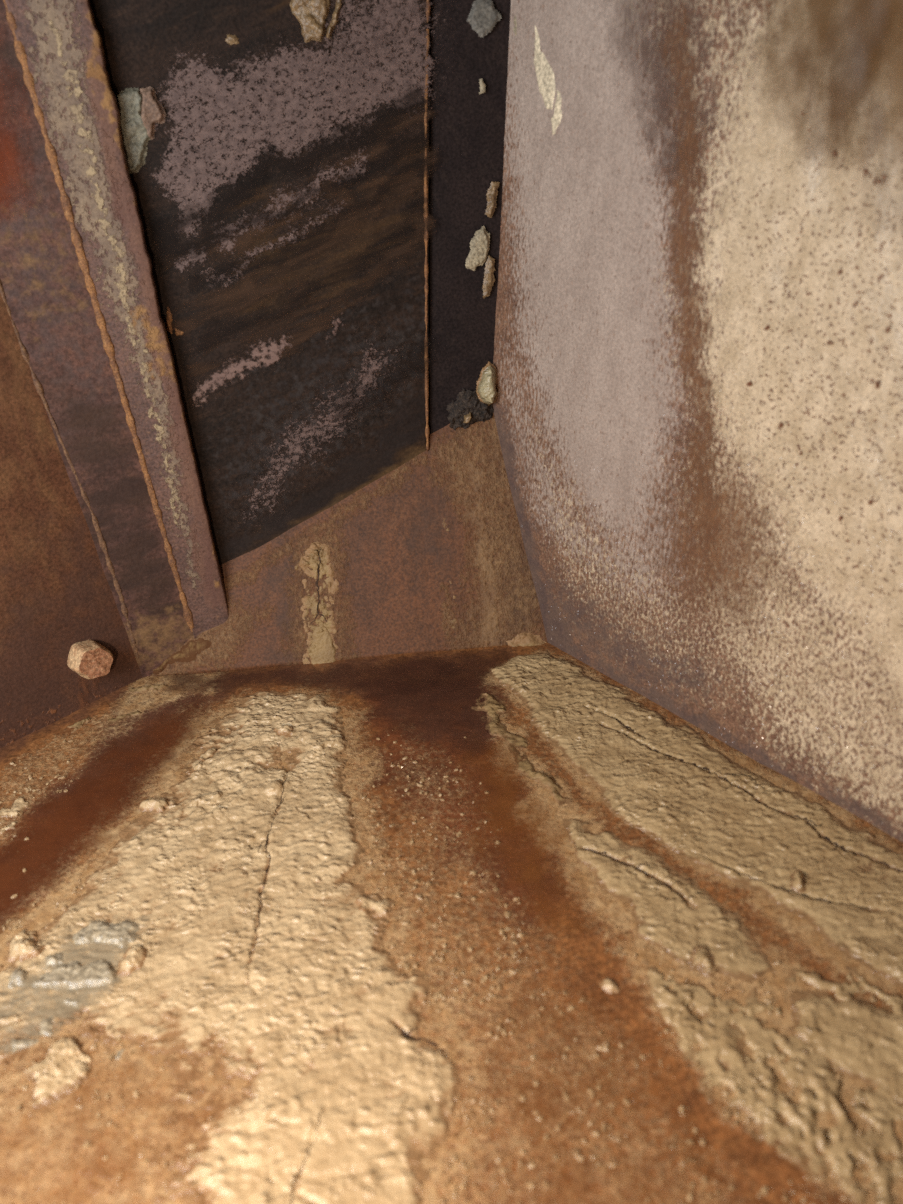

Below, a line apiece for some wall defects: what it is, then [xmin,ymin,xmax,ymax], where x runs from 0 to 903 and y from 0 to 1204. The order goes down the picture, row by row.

corrosion [166,307,184,336]
corrosion [655,15,770,622]
corrosion [0,721,188,913]
crack [248,778,287,983]
crack [579,848,695,908]
crack [582,704,903,872]
crack [696,854,897,913]